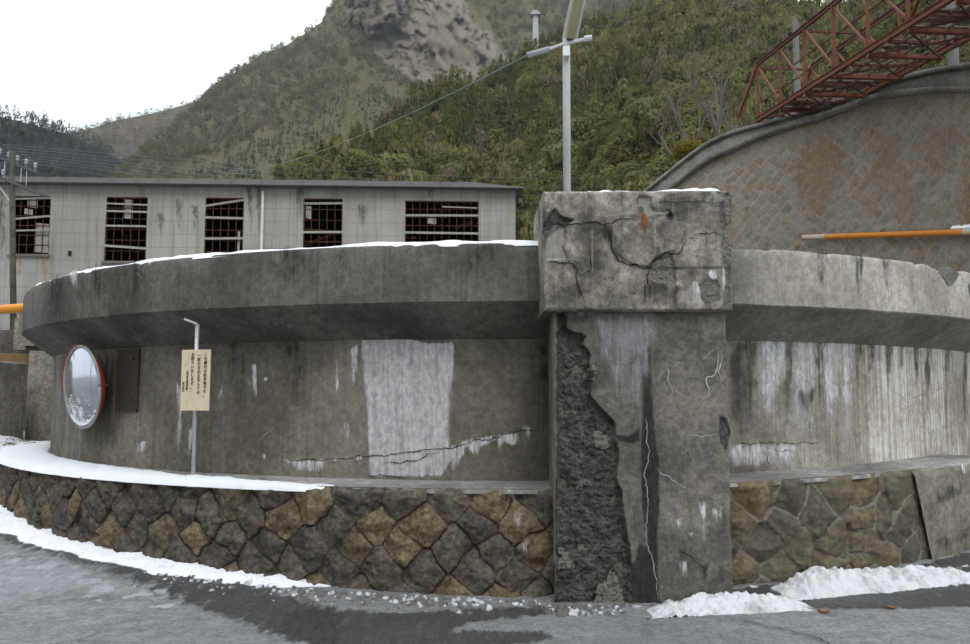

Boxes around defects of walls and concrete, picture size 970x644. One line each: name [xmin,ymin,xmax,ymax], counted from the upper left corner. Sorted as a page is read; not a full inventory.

crack [544,200,728,305]
spalling [938,266,959,286]
damp [730,341,874,431]
damp [914,347,931,384]
crack [292,429,538,479]
spalling [556,312,632,605]
damp [596,313,660,603]
efflorescence [730,442,795,465]
crack [616,422,685,593]